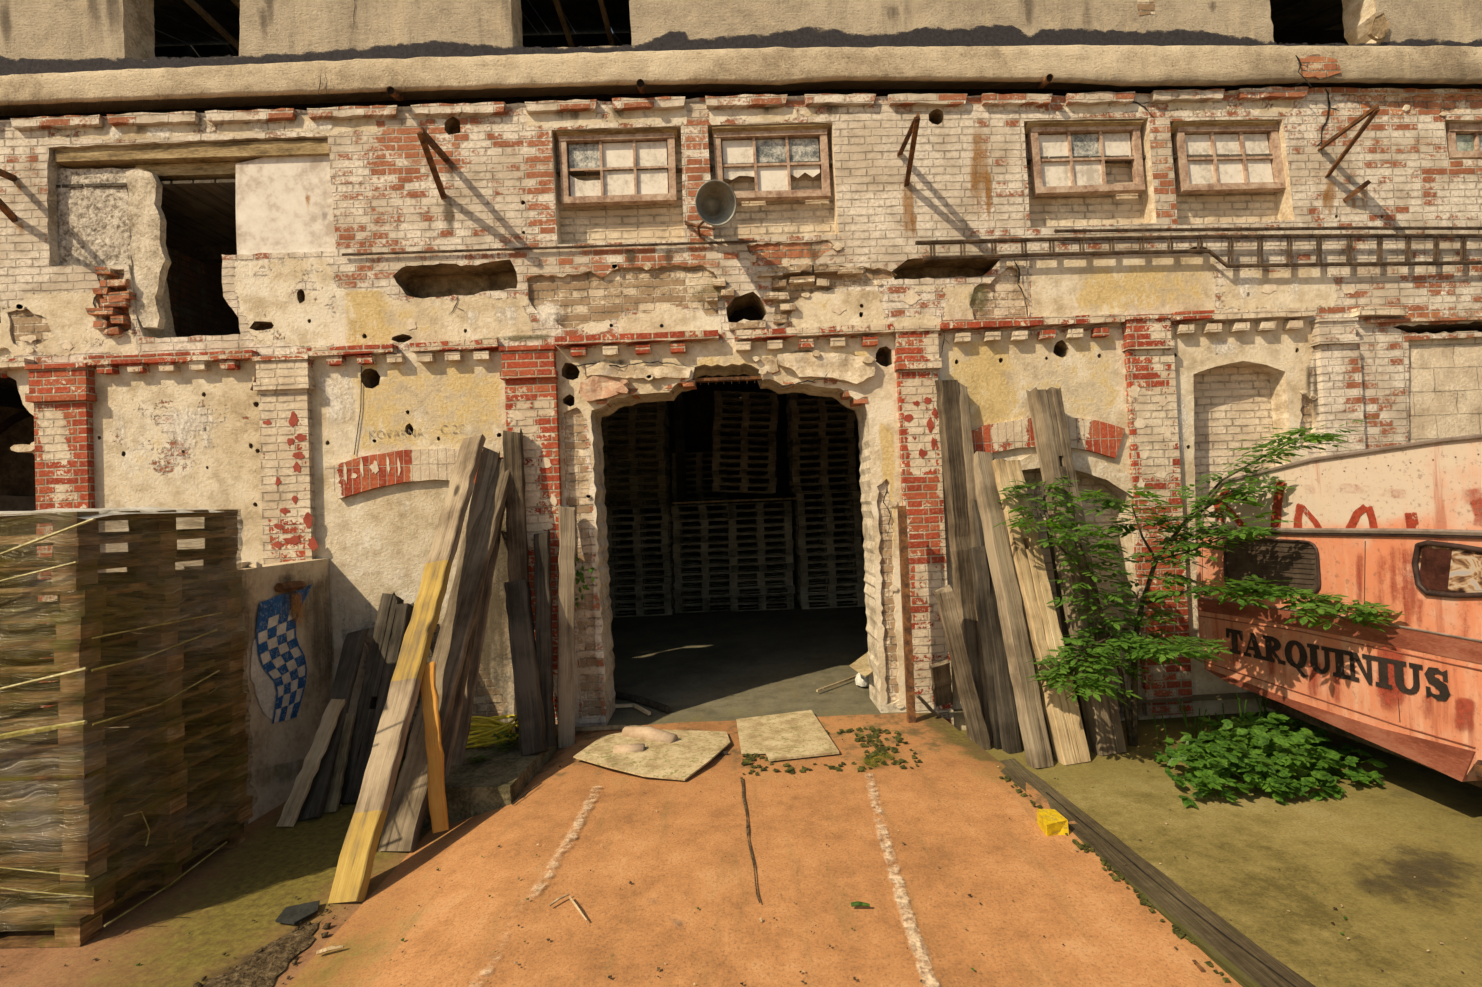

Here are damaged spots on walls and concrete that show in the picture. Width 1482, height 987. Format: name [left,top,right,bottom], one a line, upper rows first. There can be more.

corrosion [1323,183,1333,212]
spalling [95,269,134,337]
spalling [393,240,1030,329]
peeling [1262,283,1277,294]
spalling [391,319,417,343]
spalling [1393,321,1482,341]
spalling [876,346,892,367]
peeling [275,411,308,486]
peeling [272,495,318,551]